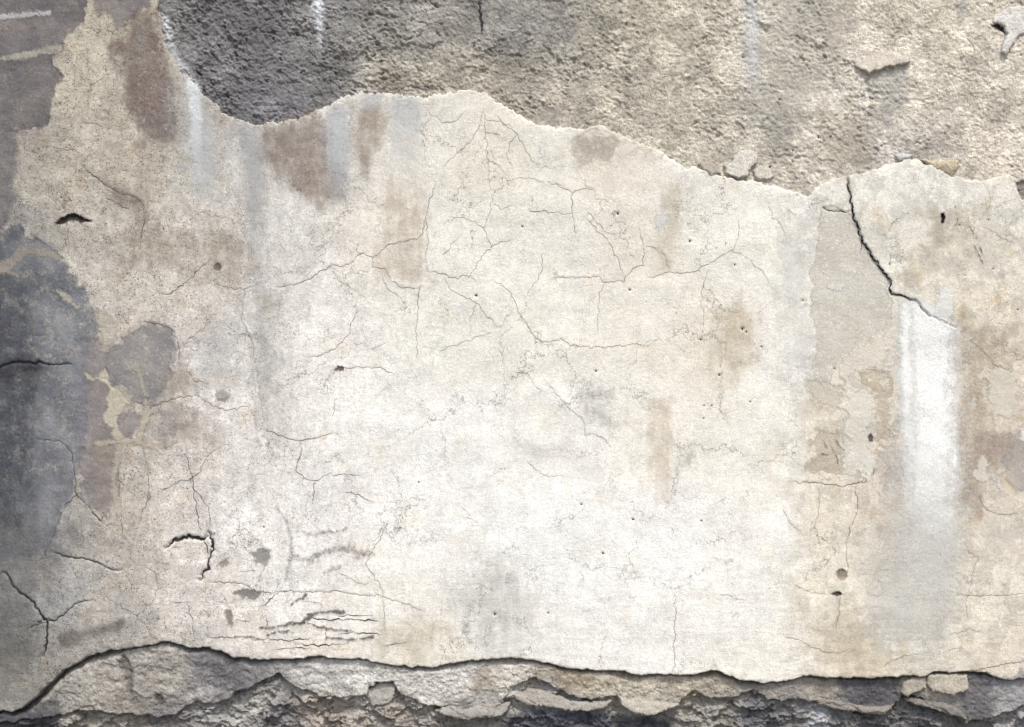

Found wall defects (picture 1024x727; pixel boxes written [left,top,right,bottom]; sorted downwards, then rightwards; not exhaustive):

leakage [163,15,207,170]
leakage [310,0,324,43]
flaking render [0,0,1024,200]
leakage [0,131,143,562]
crack [47,146,145,246]
crack [131,110,769,501]
crack [823,180,947,324]
crack [4,439,215,657]
crack [216,519,418,628]
crack [792,453,875,571]
leakage [890,299,970,610]
flaking render [1,641,1024,727]